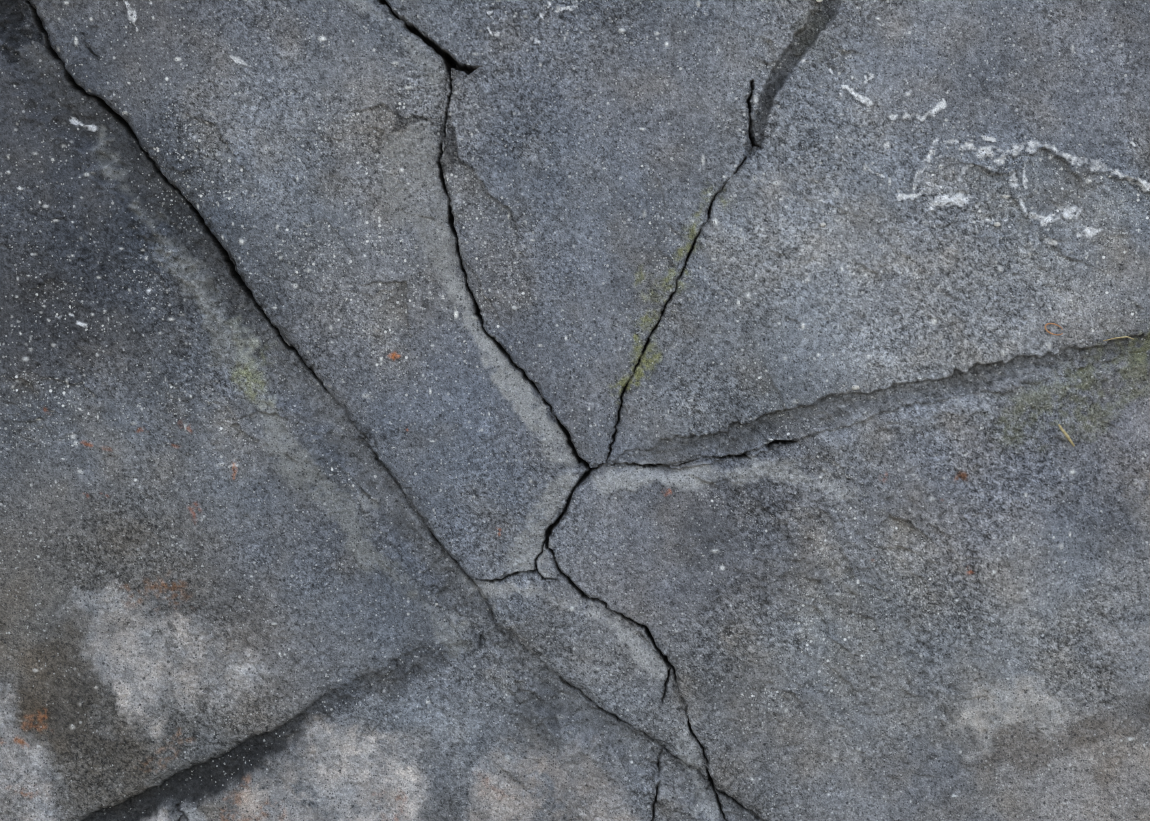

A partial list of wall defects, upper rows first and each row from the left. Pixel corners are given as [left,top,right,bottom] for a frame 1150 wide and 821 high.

crack [23,0,328,392]
crack [340,0,801,821]
crack [175,802,188,821]